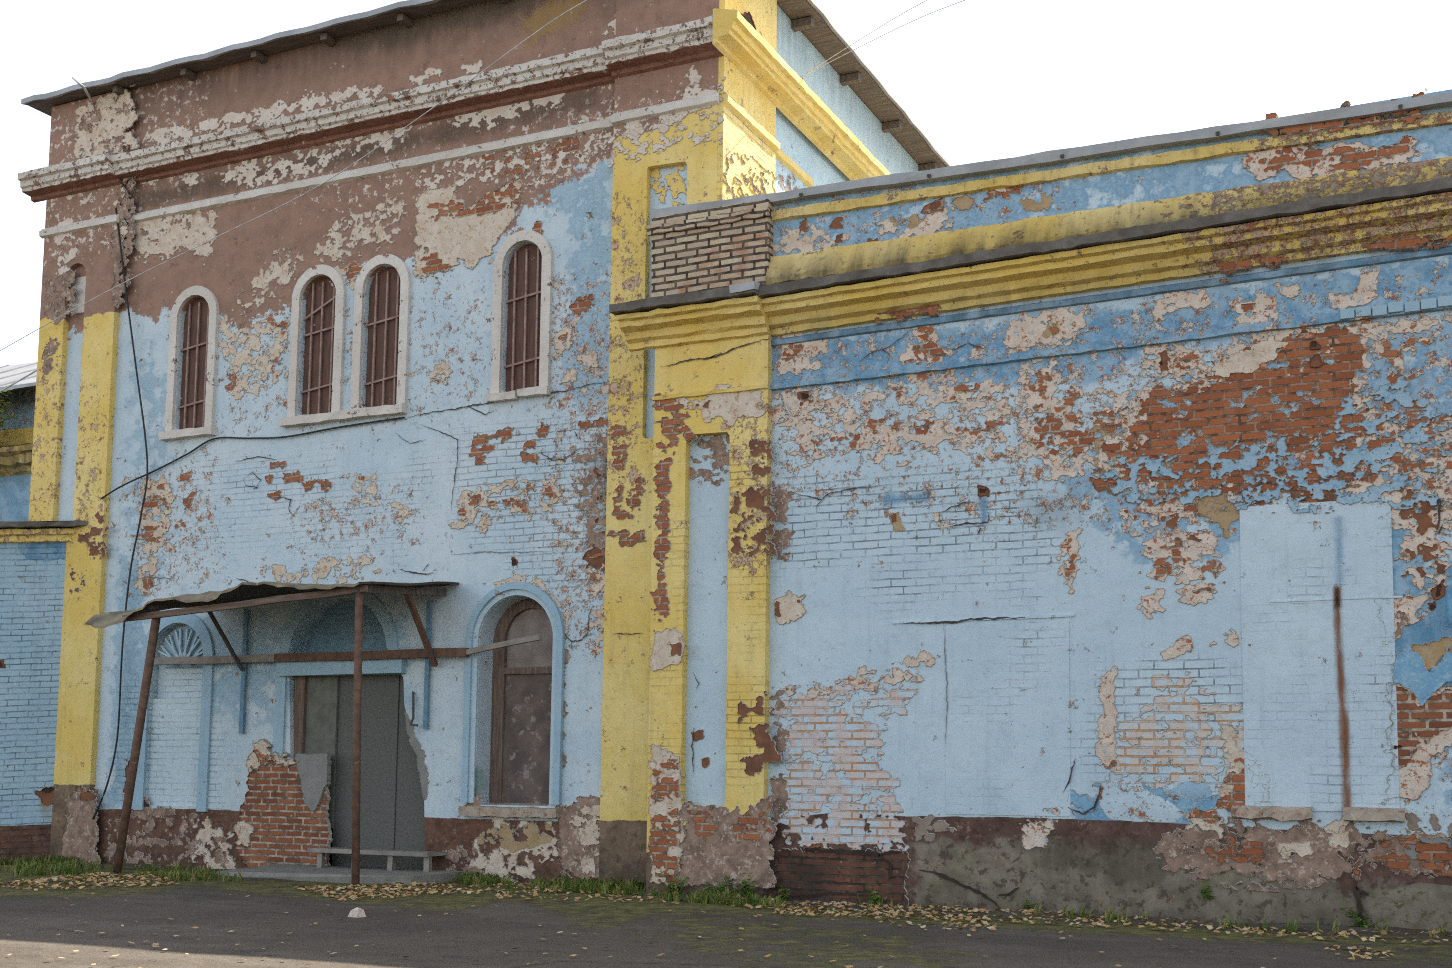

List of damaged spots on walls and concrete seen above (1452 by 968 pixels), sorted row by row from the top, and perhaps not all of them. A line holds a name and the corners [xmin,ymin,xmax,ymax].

peeling [40,192,93,381]
peeling [110,176,219,308]
peeling [181,172,200,187]
flaking render [73,83,387,159]
flaking render [217,65,798,400]
spalling [1241,87,1427,182]
spalling [133,471,197,596]
flaking render [255,554,383,584]
spalling [265,461,411,519]
spalling [442,234,1452,906]
corrosion [1334,586,1350,807]
spalling [34,739,333,869]